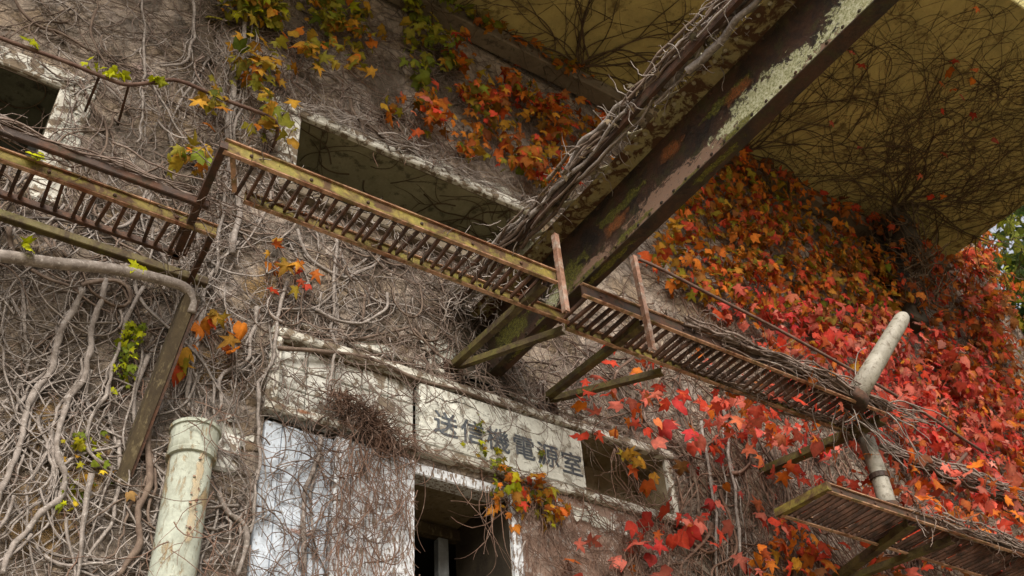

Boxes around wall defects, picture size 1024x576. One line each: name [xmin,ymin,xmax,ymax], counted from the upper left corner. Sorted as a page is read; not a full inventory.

corrosion [545,115,747,305]